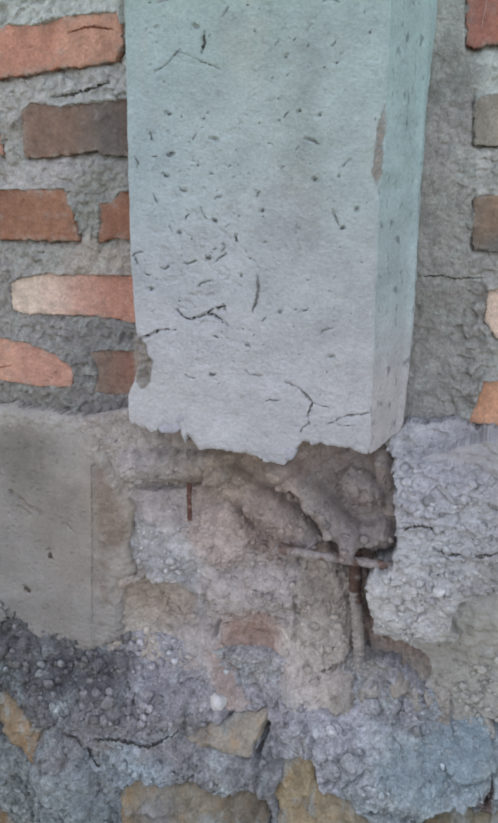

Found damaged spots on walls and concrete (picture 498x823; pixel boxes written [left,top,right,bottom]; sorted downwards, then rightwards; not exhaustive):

spalling [78,407,498,725]
crack [285,382,366,432]